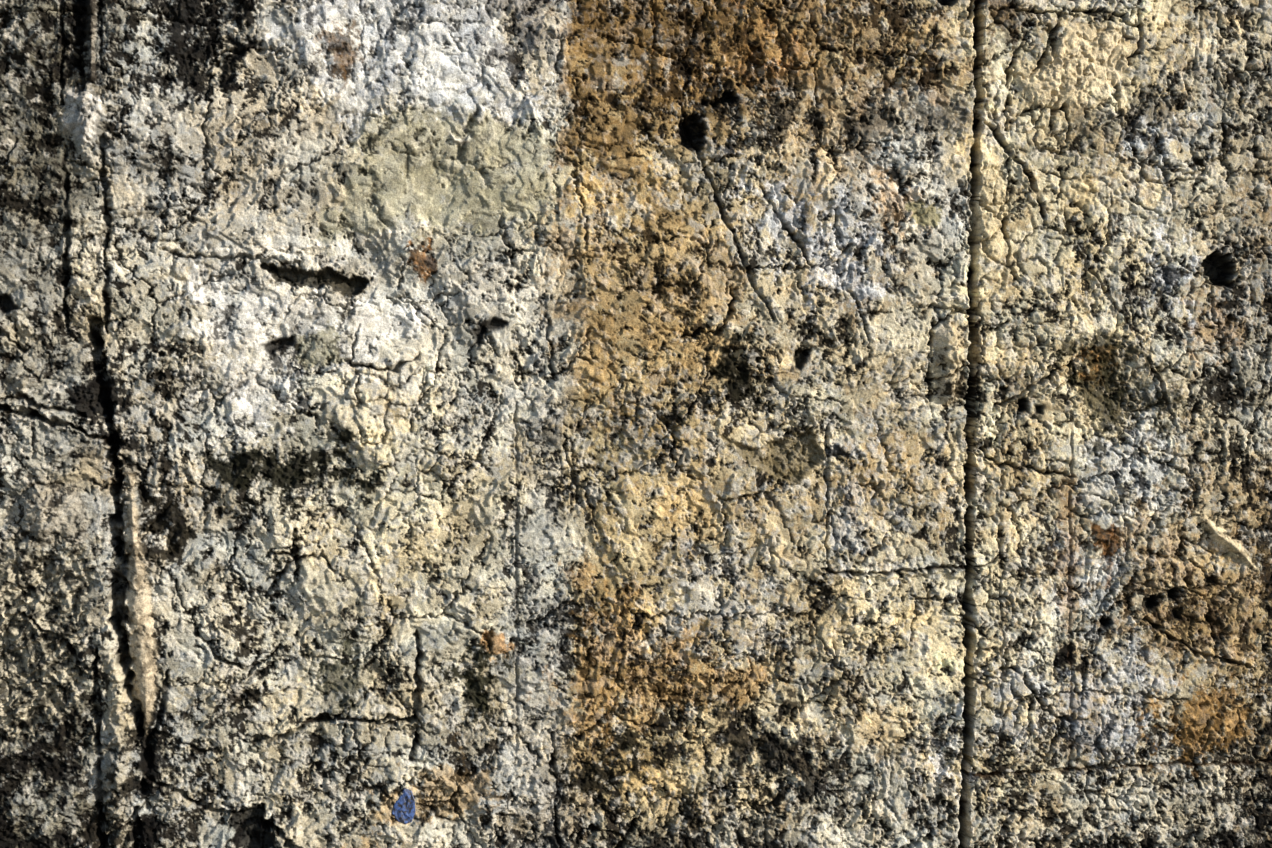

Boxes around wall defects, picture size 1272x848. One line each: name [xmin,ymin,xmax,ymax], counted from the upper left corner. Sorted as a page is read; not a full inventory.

corrosion [404,234,441,292]
crack [819,345,1272,781]
corrosion [1046,459,1272,786]